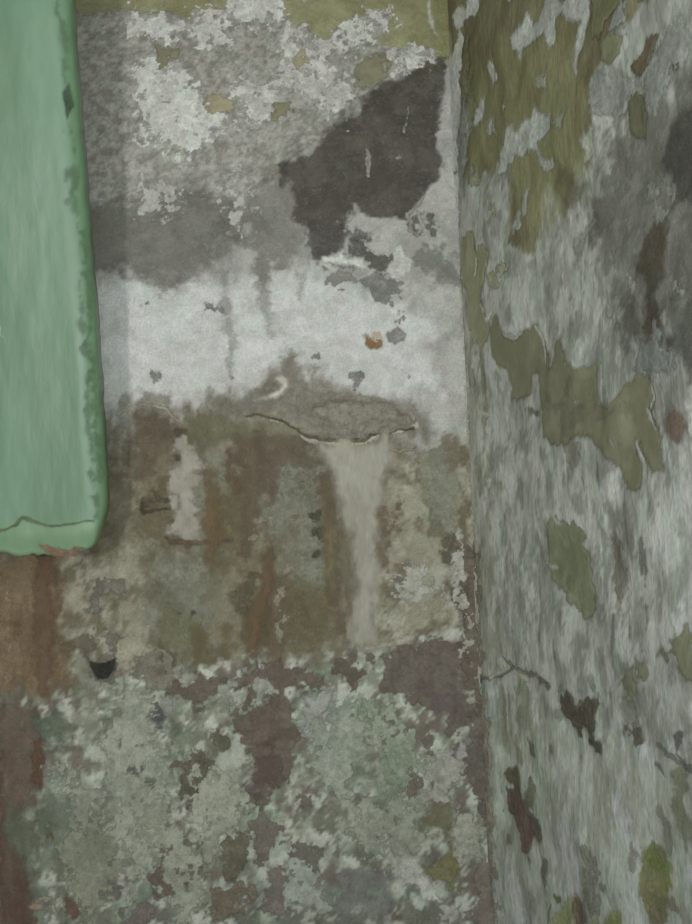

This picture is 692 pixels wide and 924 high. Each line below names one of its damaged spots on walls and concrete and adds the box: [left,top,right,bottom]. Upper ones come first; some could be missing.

water stain [91,58,461,309]
peeling [77,0,690,491]
crack [246,413,419,453]
peeling [547,512,597,619]
peeling [613,533,627,604]
peeling [656,623,692,682]
corrosion [0,545,84,924]
peeling [40,483,542,924]
spalling [539,676,602,754]
peeling [621,659,648,747]
peeling [671,768,692,850]
spalling [572,844,606,924]